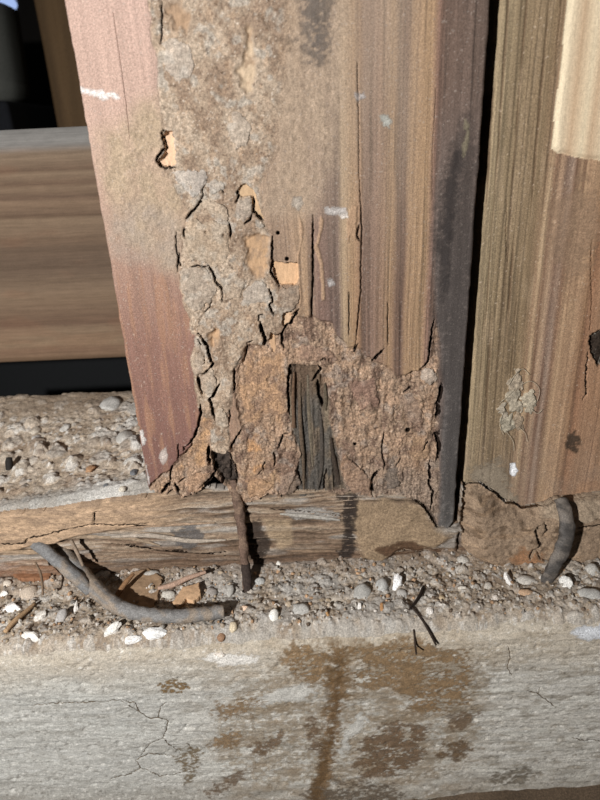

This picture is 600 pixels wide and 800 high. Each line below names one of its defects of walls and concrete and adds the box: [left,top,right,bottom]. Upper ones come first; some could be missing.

crack [348,78,363,352]
crack [175,189,263,312]
crack [161,219,314,493]
crack [313,358,326,404]
crack [373,304,389,360]
crack [425,322,434,364]
crack [370,434,401,491]
crack [423,383,443,509]
water stain [202,653,259,667]
water stain [239,683,316,708]
crack [35,699,196,779]
water stain [338,712,369,755]